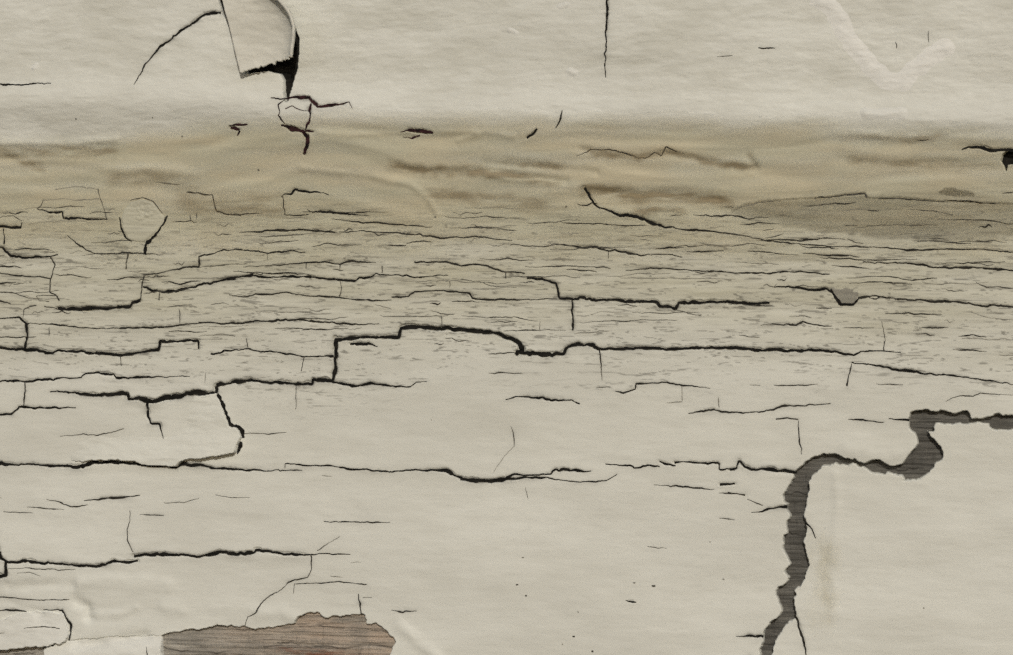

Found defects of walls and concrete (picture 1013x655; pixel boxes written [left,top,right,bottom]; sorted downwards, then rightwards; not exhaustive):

crack [0,80,51,88]
crack [134,11,221,84]
peeling [220,0,300,101]
crack [602,0,610,77]
crack [271,96,352,155]
crack [0,182,1013,655]
peeling [0,610,396,655]